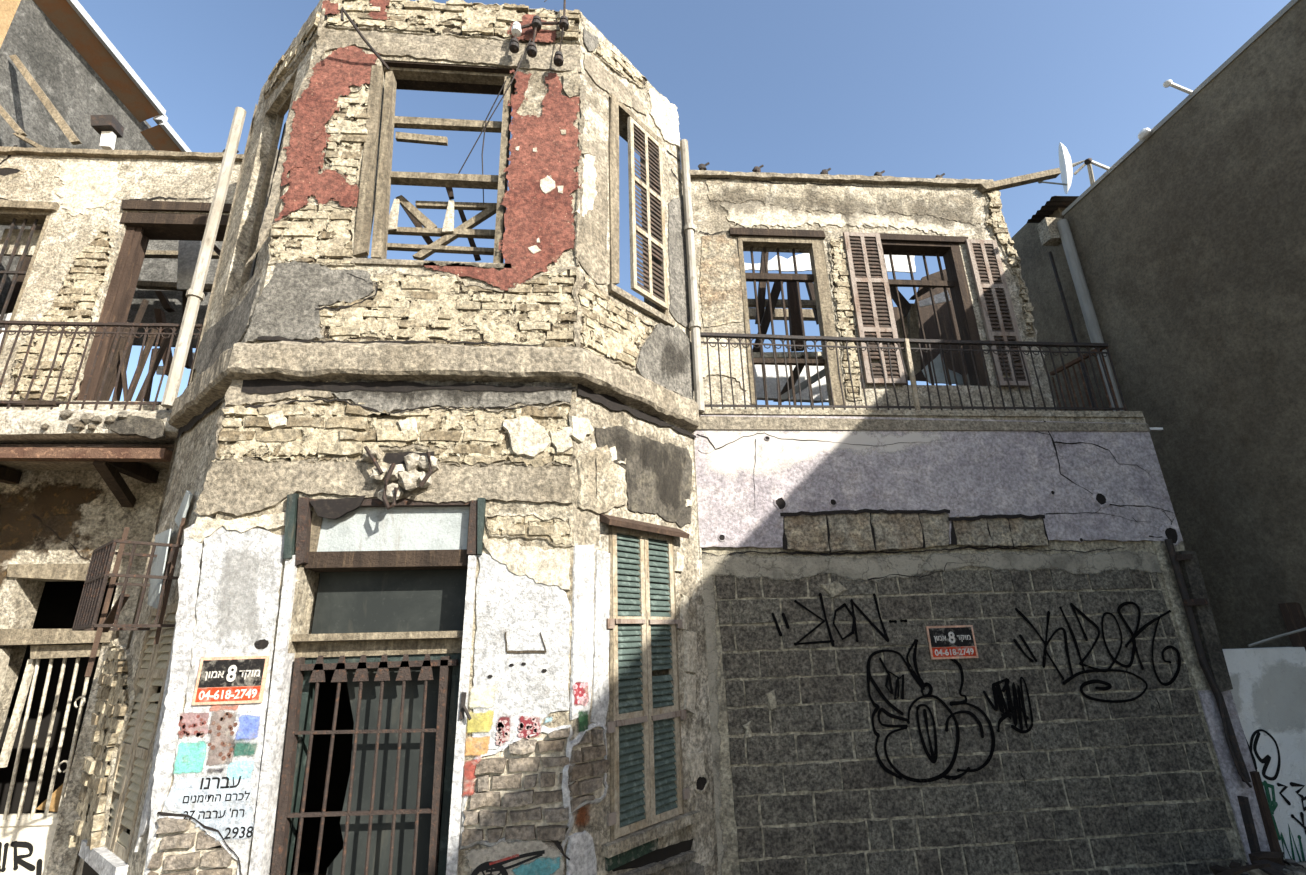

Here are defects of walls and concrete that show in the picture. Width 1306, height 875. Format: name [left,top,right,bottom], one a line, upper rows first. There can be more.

flaking render [263,0,648,100]
spalling [0,165,27,183]
flaking render [268,203,357,267]
flaking render [325,84,370,186]
peeling [540,175,563,194]
flaking render [319,266,655,371]
water stain [0,480,106,588]
flaking render [211,396,628,549]
crack [702,421,1178,580]
flaking render [459,722,609,856]
flaking render [143,813,242,875]